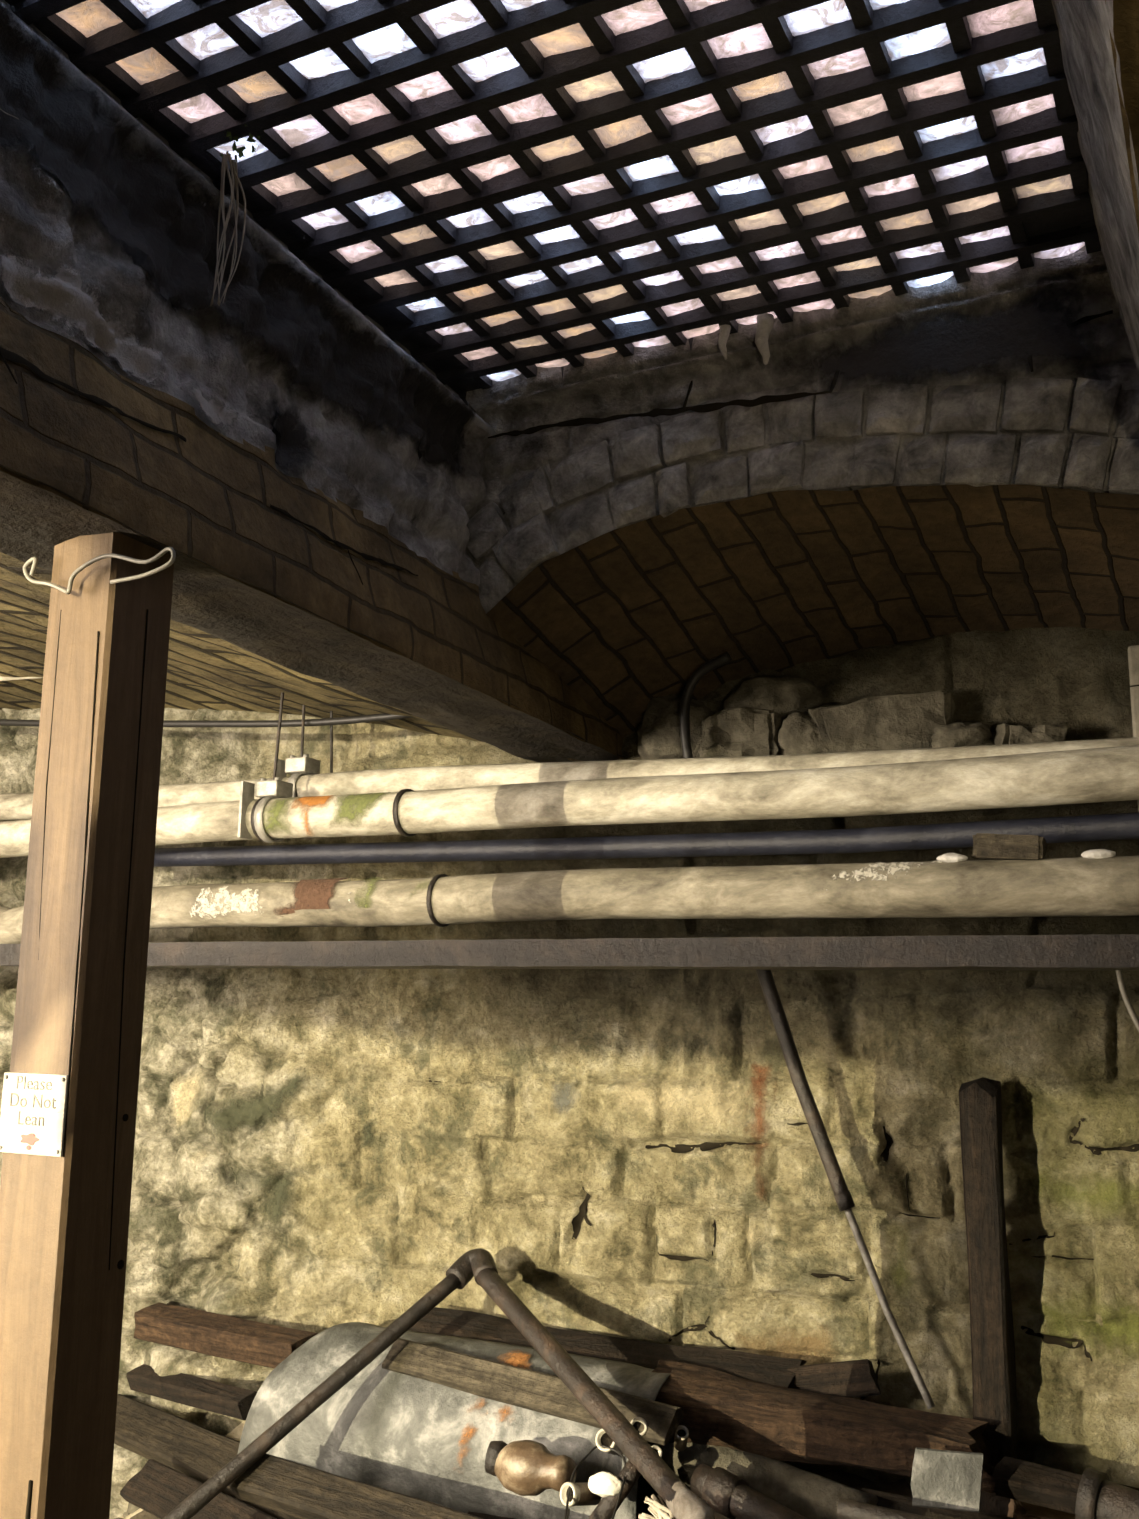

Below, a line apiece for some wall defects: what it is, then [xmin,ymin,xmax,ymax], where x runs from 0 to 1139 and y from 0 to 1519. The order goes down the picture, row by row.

crack [488,381,836,438]
crack [645,1122,808,1153]
crack [1069,1118,1139,1155]
crack [571,1186,592,1240]